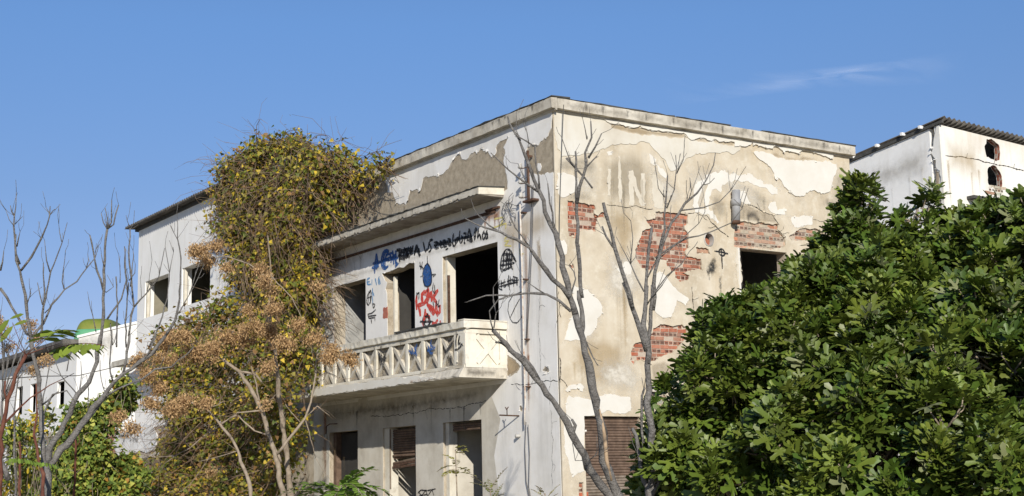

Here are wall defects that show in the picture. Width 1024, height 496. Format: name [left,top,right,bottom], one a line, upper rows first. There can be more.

peeling [325,136,509,237]
flaking render [525,131,605,268]
crack [945,153,1024,171]
flaking render [564,145,837,496]